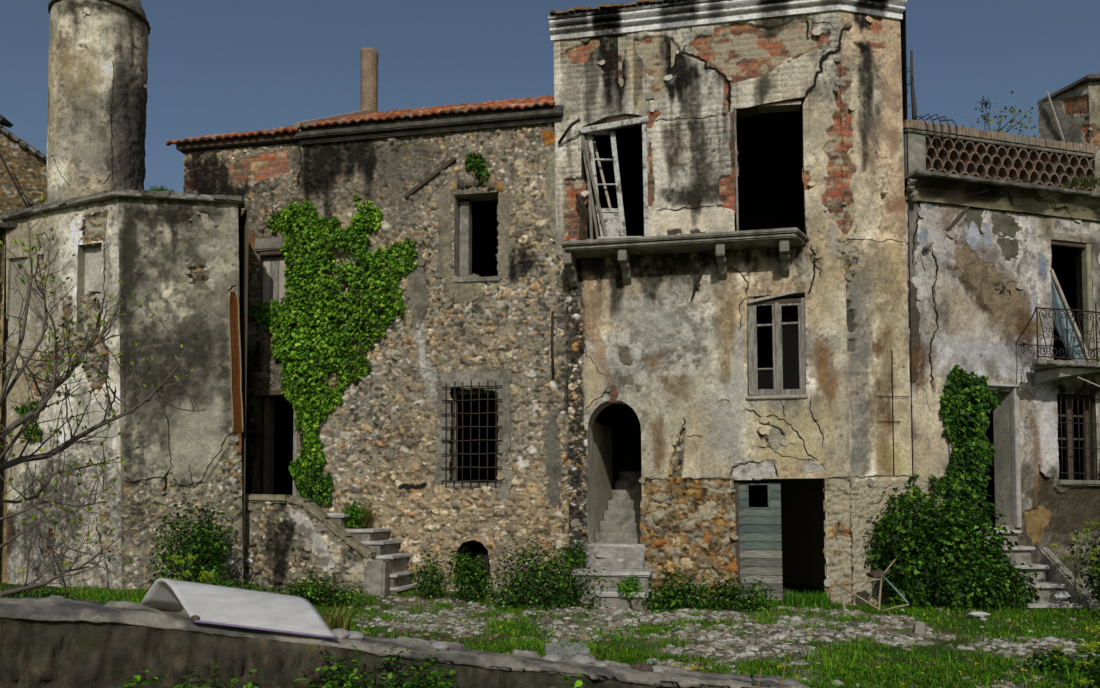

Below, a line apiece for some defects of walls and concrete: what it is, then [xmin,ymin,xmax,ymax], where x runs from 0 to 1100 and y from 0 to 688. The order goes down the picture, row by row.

damp [58,0,142,24]
damp [558,8,626,115]
damp [661,0,696,20]
damp [661,35,726,221]
crack [658,44,732,120]
flaking render [28,291,110,399]
flaking render [79,212,108,246]
flaking render [561,18,862,352]
crack [848,201,939,408]
flaking render [945,208,1042,344]
crack [125,409,234,496]
crack [647,397,914,480]